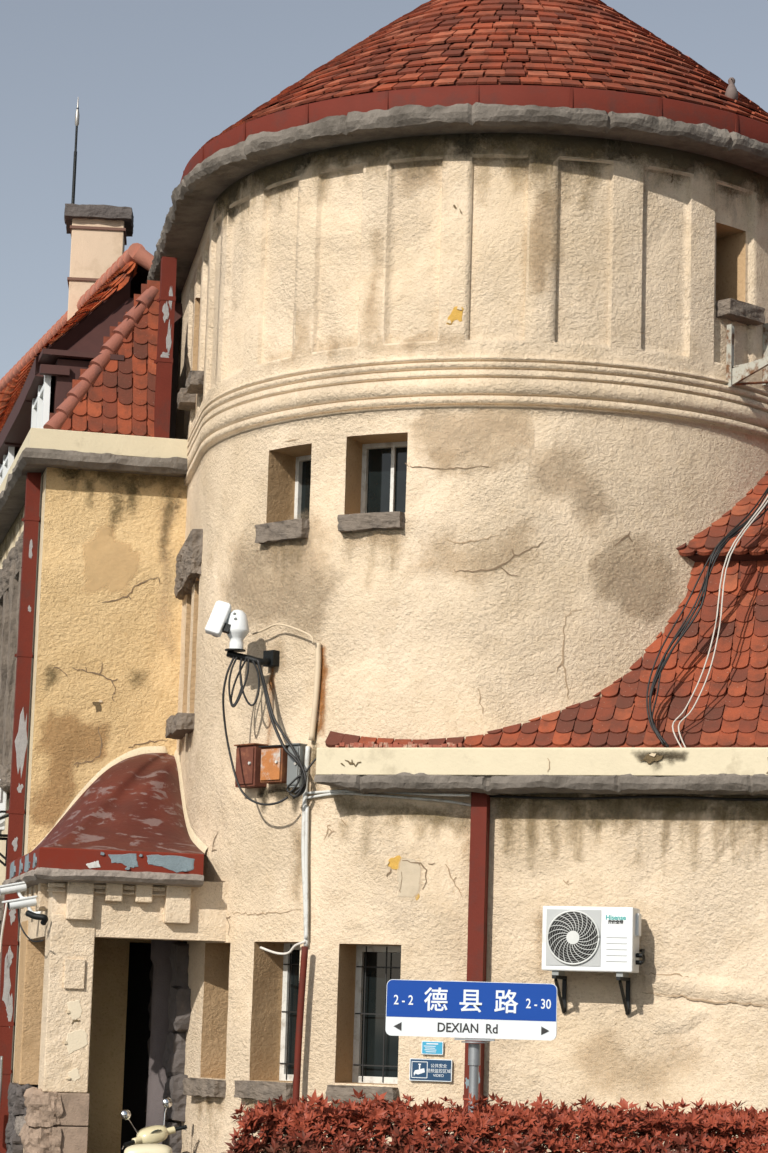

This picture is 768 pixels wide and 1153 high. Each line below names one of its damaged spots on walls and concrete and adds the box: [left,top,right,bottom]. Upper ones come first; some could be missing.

water stain [214,133,768,221]
peeling [161,286,173,358]
water stain [62,469,178,529]
crack [449,535,543,576]
crack [54,667,118,701]
peeling [15,708,28,793]
crack [74,727,102,766]
water stain [496,793,768,826]
peeling [86,852,195,873]
peeling [385,855,401,870]